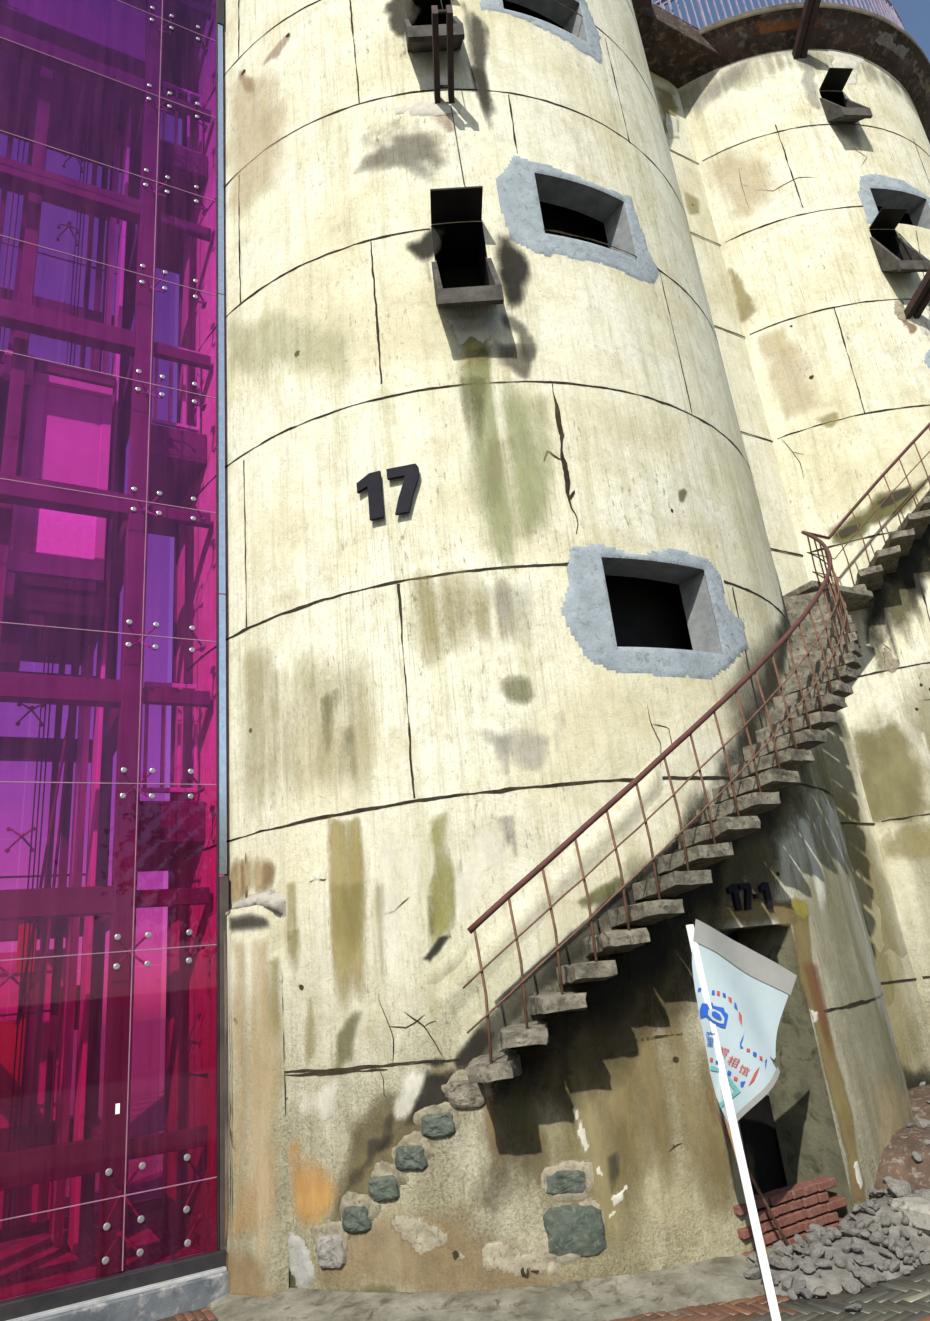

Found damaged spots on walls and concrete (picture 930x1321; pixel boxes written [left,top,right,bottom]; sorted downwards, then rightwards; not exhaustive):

water stain [408,227,443,259]
water stain [464,236,546,555]
crack [543,384,578,534]
water stain [832,483,923,543]
water stain [866,524,930,668]
water stain [505,679,531,701]
water stain [329,692,930,1240]
crack [282,996,444,1114]
rust [294,1166,332,1219]